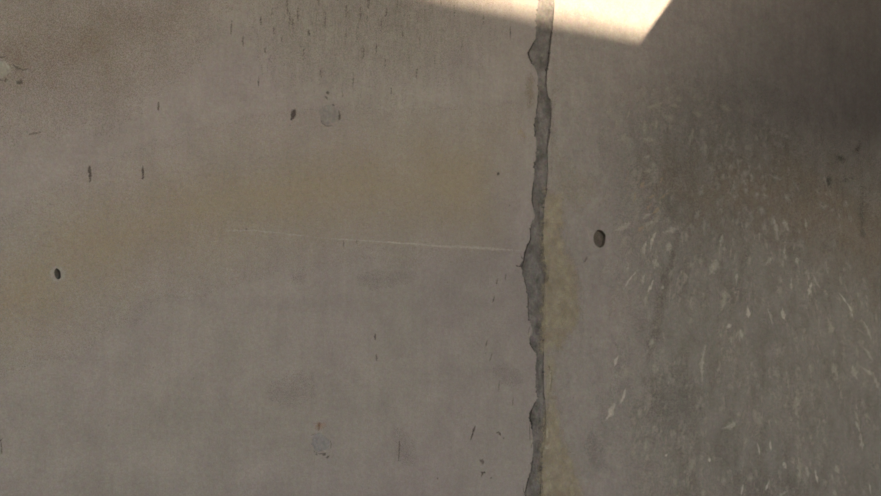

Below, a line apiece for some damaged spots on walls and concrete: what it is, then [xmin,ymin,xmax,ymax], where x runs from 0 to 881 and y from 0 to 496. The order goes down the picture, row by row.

damp [536,185,585,496]